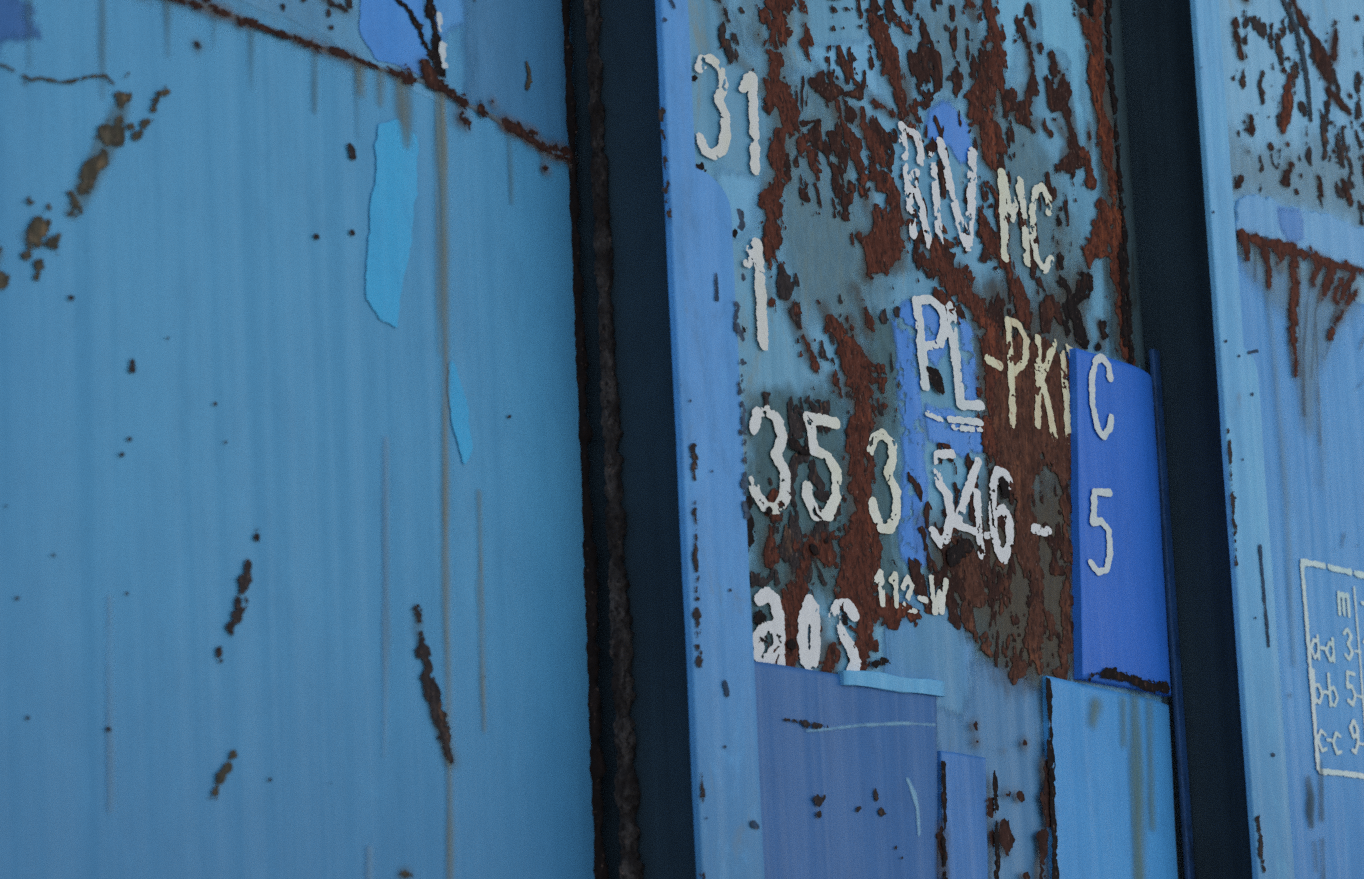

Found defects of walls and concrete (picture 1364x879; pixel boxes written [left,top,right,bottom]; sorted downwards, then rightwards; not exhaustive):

rust [166,0,573,327]
rust [658,107,672,218]
rust [1280,72,1294,147]
rust [1291,0,1353,116]
rust [720,0,1136,685]
rust [1237,228,1364,416]
rust [689,440,699,481]
rust [692,501,704,668]
rust [1088,667,1170,696]
rust [936,825,948,877]
rust [986,759,1051,879]